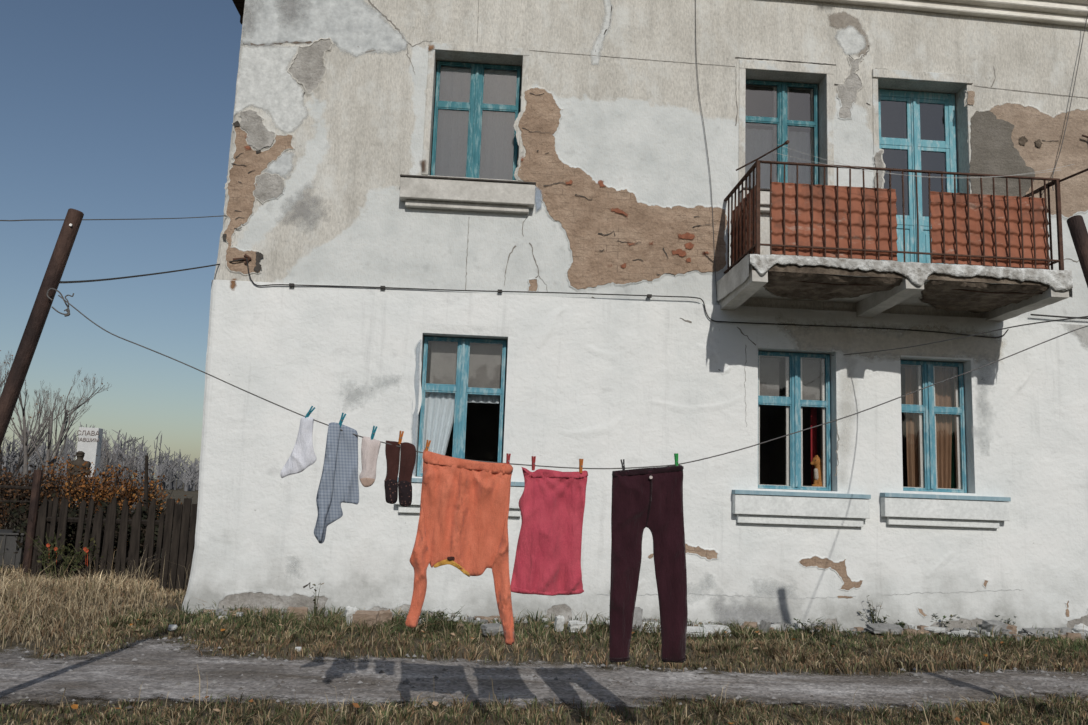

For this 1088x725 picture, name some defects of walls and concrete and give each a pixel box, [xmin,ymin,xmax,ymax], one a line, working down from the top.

flaking render [287,37,335,97]
crack [368,0,432,73]
flaking render [829,12,868,121]
flaking render [221,108,295,277]
flaking render [514,86,730,294]
flaking render [964,91,1088,221]
spalling [763,272,902,300]
spalling [919,280,1049,313]
flaking render [685,542,719,562]
flaking render [798,554,864,598]